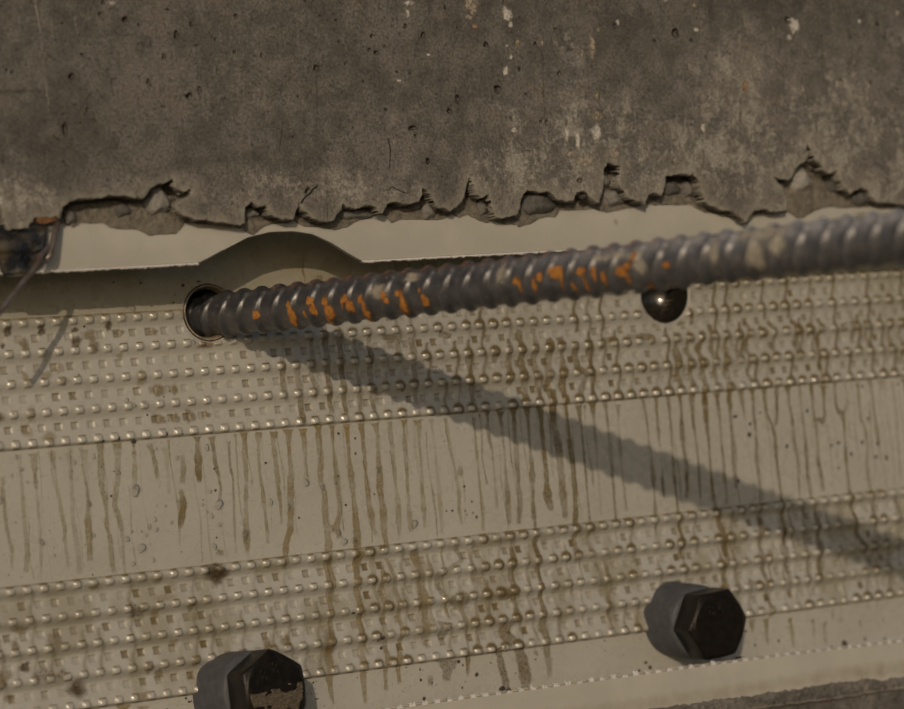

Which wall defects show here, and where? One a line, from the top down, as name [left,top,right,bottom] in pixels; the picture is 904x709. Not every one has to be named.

spalling [33,161,904,236]
corrosion [286,294,374,338]
corrosion [380,289,410,318]
corrosion [512,251,636,293]
corrosion [325,365,348,412]
corrosion [485,334,596,538]
corrosion [651,324,791,589]
corrosion [270,408,387,631]
corrosion [209,564,228,584]
corrosion [532,540,547,635]
corrosion [495,625,545,690]